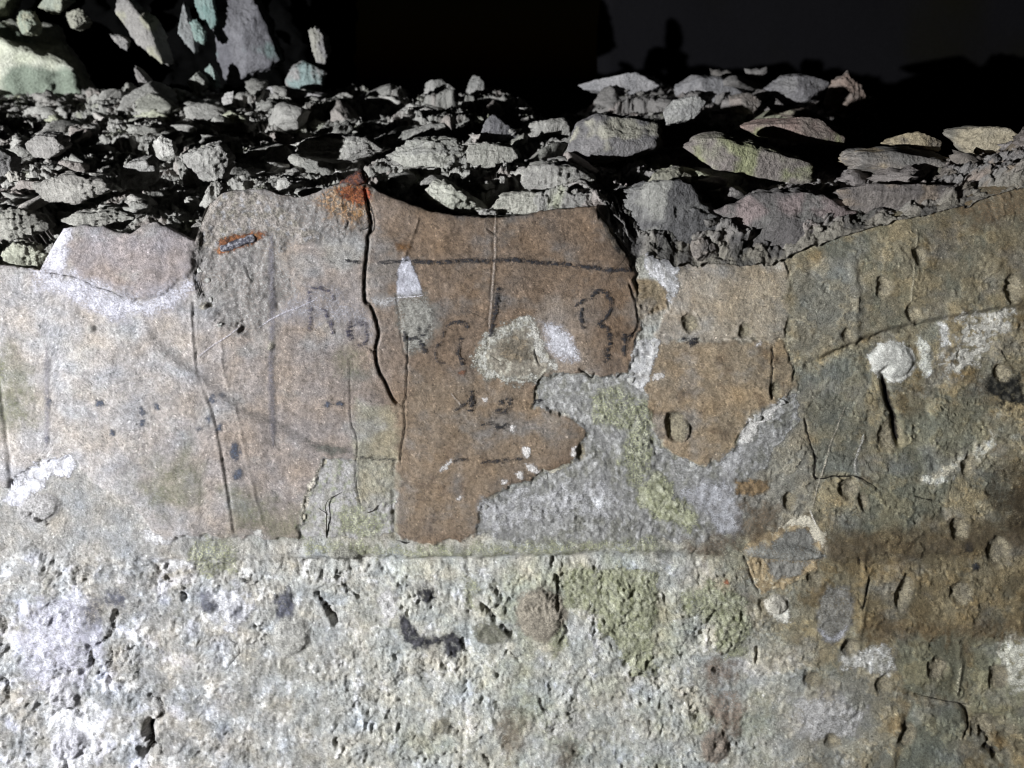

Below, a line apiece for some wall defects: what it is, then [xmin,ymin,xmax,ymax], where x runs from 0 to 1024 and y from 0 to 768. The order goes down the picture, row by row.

corrosion [215,230,265,255]
corrosion [313,183,374,224]
crack [346,194,408,460]
spalling [469,316,800,548]